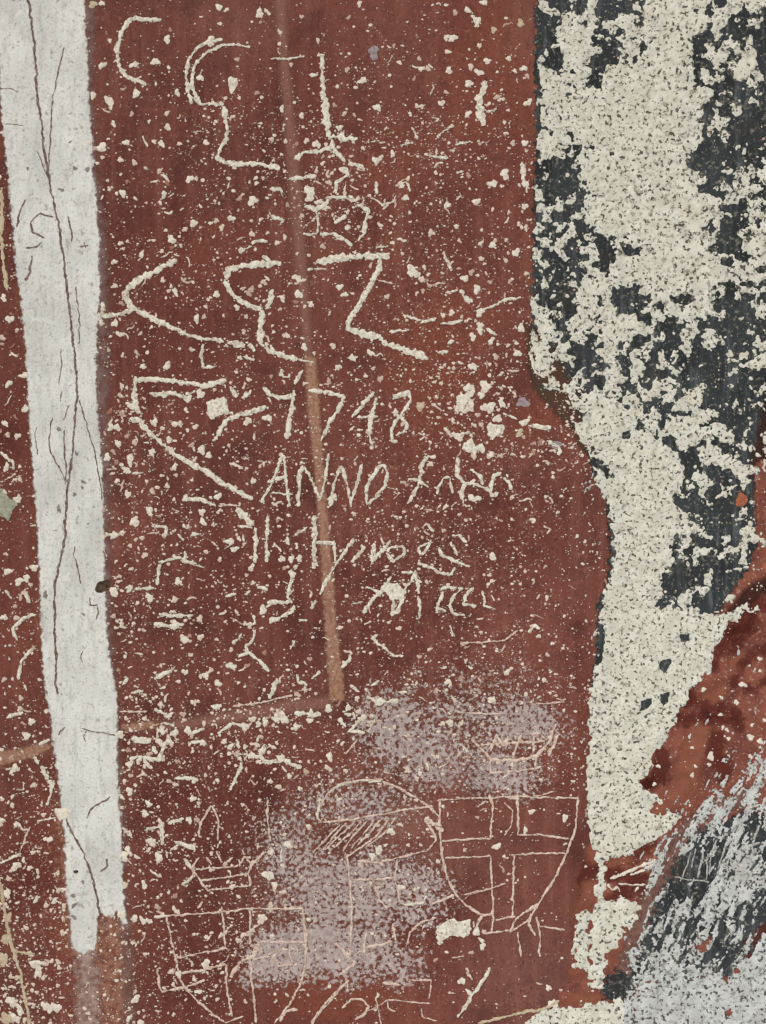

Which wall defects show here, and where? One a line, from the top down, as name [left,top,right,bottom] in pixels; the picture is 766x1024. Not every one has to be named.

crack [0,0,102,694]
crack [58,727,115,742]
crack [66,797,110,932]
flaking render [487,0,766,1024]